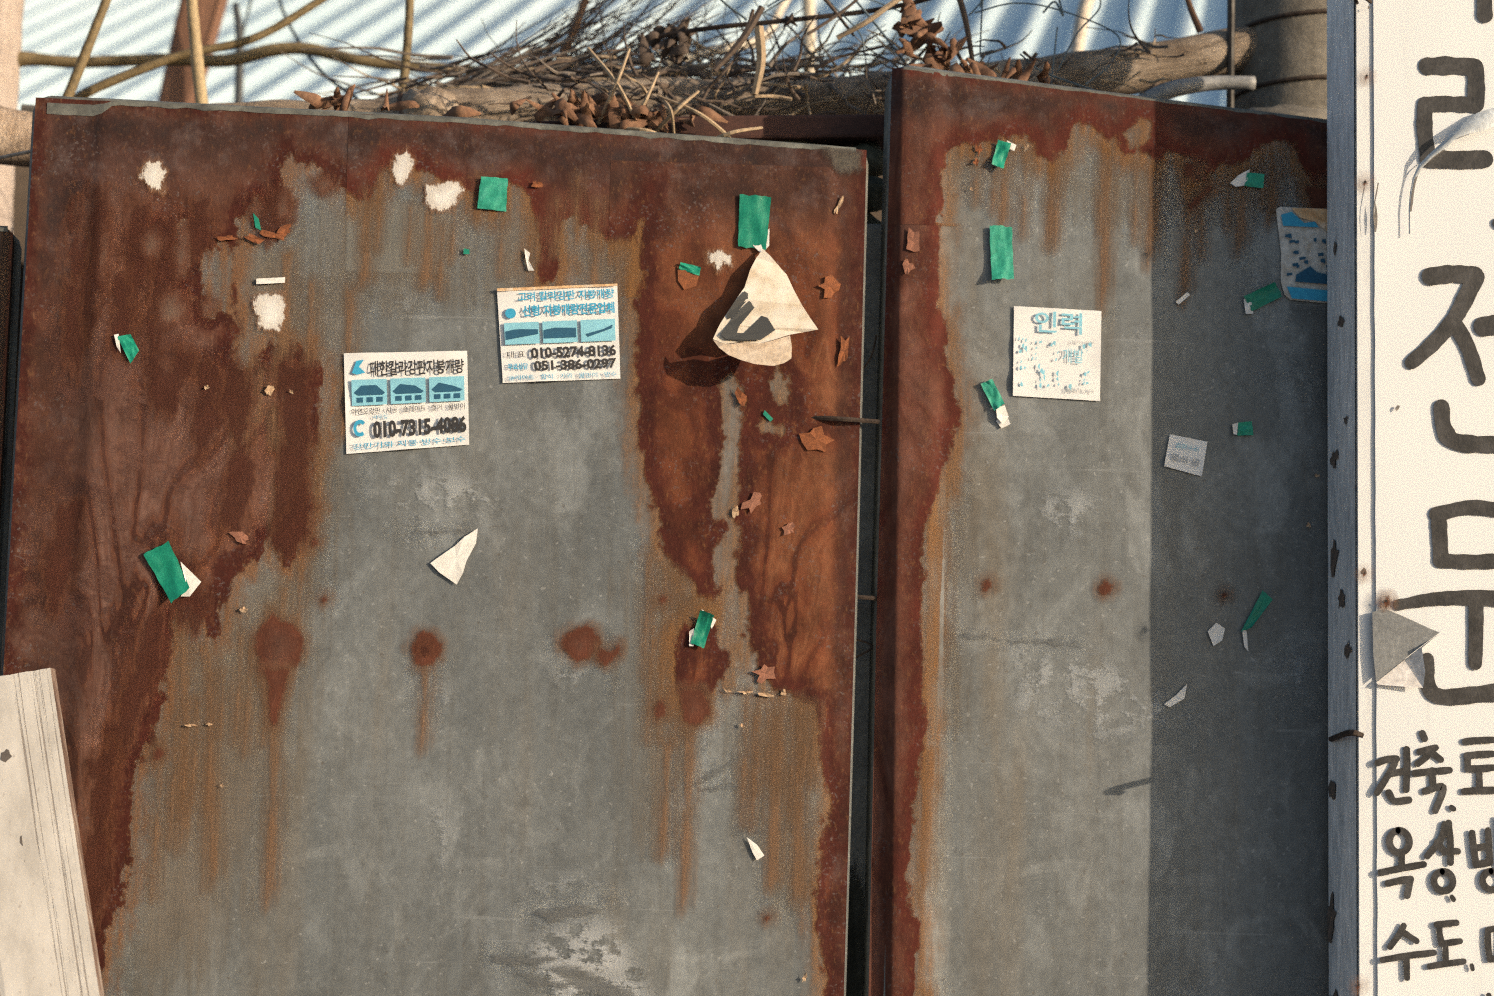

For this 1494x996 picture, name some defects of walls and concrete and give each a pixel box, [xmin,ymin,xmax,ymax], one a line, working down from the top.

rust [0,97,867,996]
rust [869,68,1327,996]